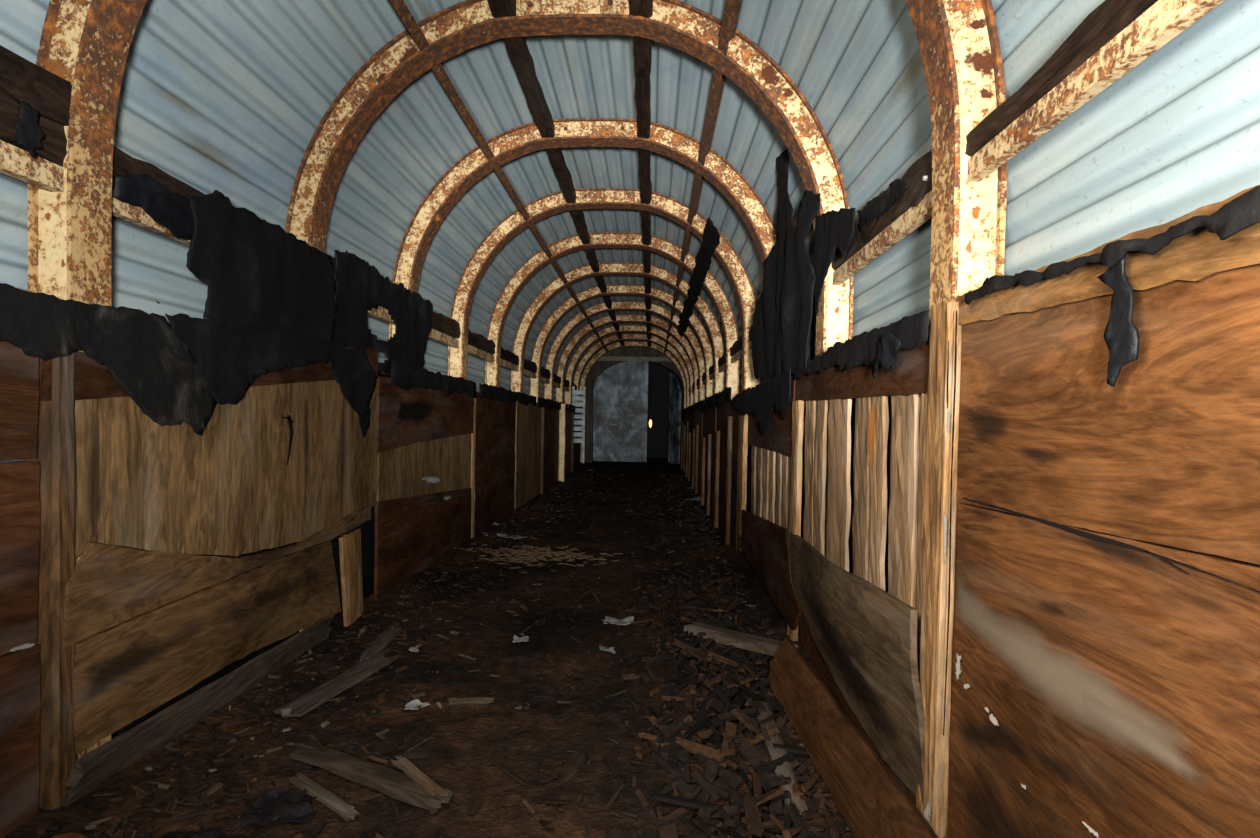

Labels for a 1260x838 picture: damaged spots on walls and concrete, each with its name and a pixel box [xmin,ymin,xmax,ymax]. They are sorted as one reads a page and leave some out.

rust [969,19,986,29]
rust [46,58,72,81]
rust [401,47,418,62]
rust [762,66,793,97]
rust [964,47,994,98]
crack [943,310,1260,736]